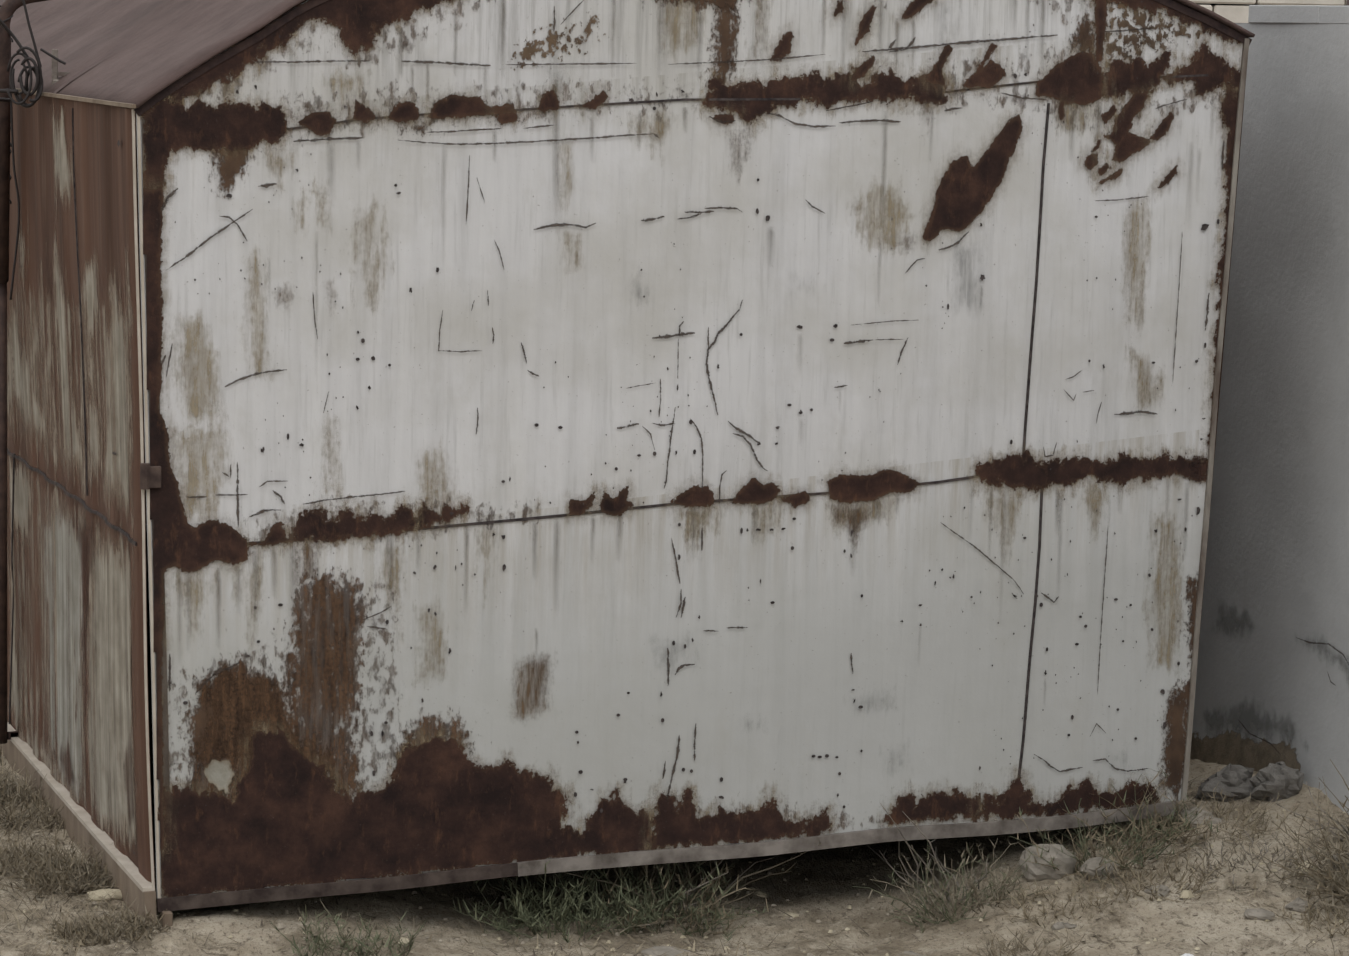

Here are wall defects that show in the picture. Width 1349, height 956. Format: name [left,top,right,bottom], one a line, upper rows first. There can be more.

rust [141,0,845,897]
rust [827,469,921,504]
rust [973,419,1211,496]
rust [73,522,92,645]
rust [862,576,1198,827]
rust [60,743,73,783]
peeling [204,759,235,794]